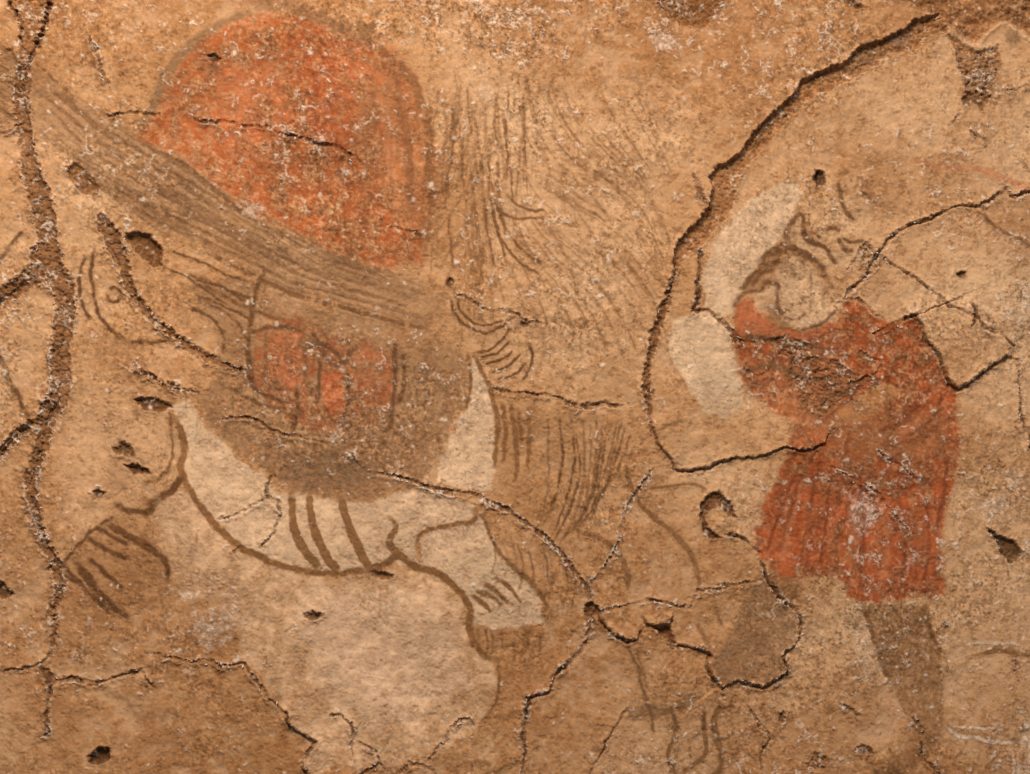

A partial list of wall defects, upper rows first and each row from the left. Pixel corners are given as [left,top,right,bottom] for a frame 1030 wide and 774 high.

spalling [654,0,726,30]
spalling [897,0,1030,113]
crack [192,116,363,164]
crack [948,112,991,143]
crack [492,12,949,416]
spalling [123,230,164,269]
crack [808,186,1030,450]
crack [0,0,279,740]
spalling [983,524,1025,565]
crack [216,415,805,774]
crack [839,703,862,718]
crack [901,711,942,774]